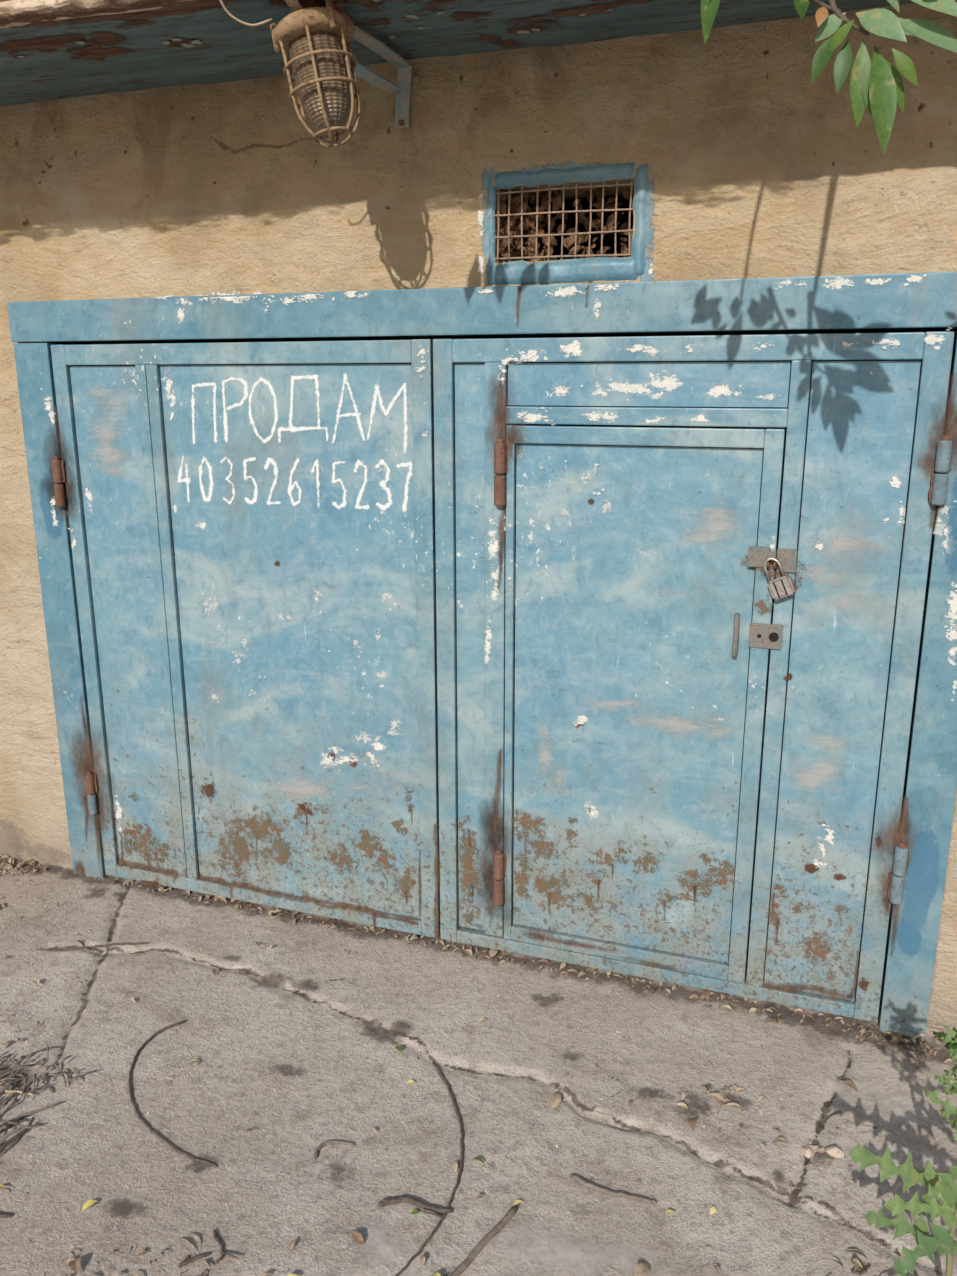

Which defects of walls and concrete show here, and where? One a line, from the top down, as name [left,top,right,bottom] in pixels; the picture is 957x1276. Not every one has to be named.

peeling [0,0,247,61]
peeling [775,274,926,289]
rust [47,408,74,521]
peeling [498,340,584,384]
peeling [516,370,683,425]
rust [923,374,957,474]
peeling [944,582,957,665]
peeling [320,718,402,771]
rust [117,824,178,887]
rust [199,802,439,939]
rust [456,751,656,923]
rust [657,853,735,936]